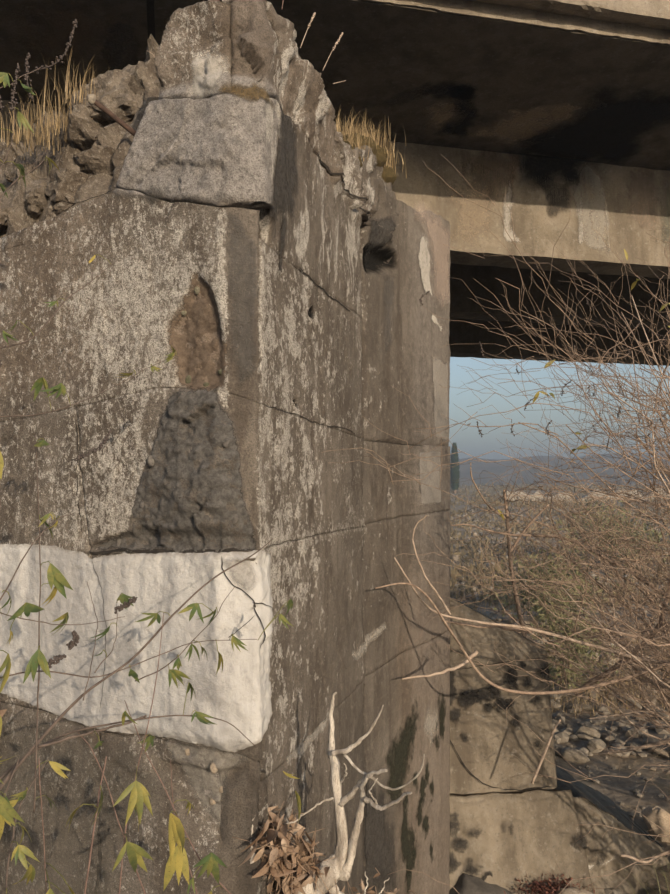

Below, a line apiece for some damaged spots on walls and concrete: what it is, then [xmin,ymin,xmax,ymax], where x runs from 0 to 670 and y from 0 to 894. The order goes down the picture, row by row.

leakage [454,150,518,241]
leakage [510,88,670,249]
crack [300,268,351,313]
crack [266,405,422,446]
peeling [0,272,273,825]
leakage [425,661,551,740]
crack [450,740,554,791]
leakage [364,781,415,891]